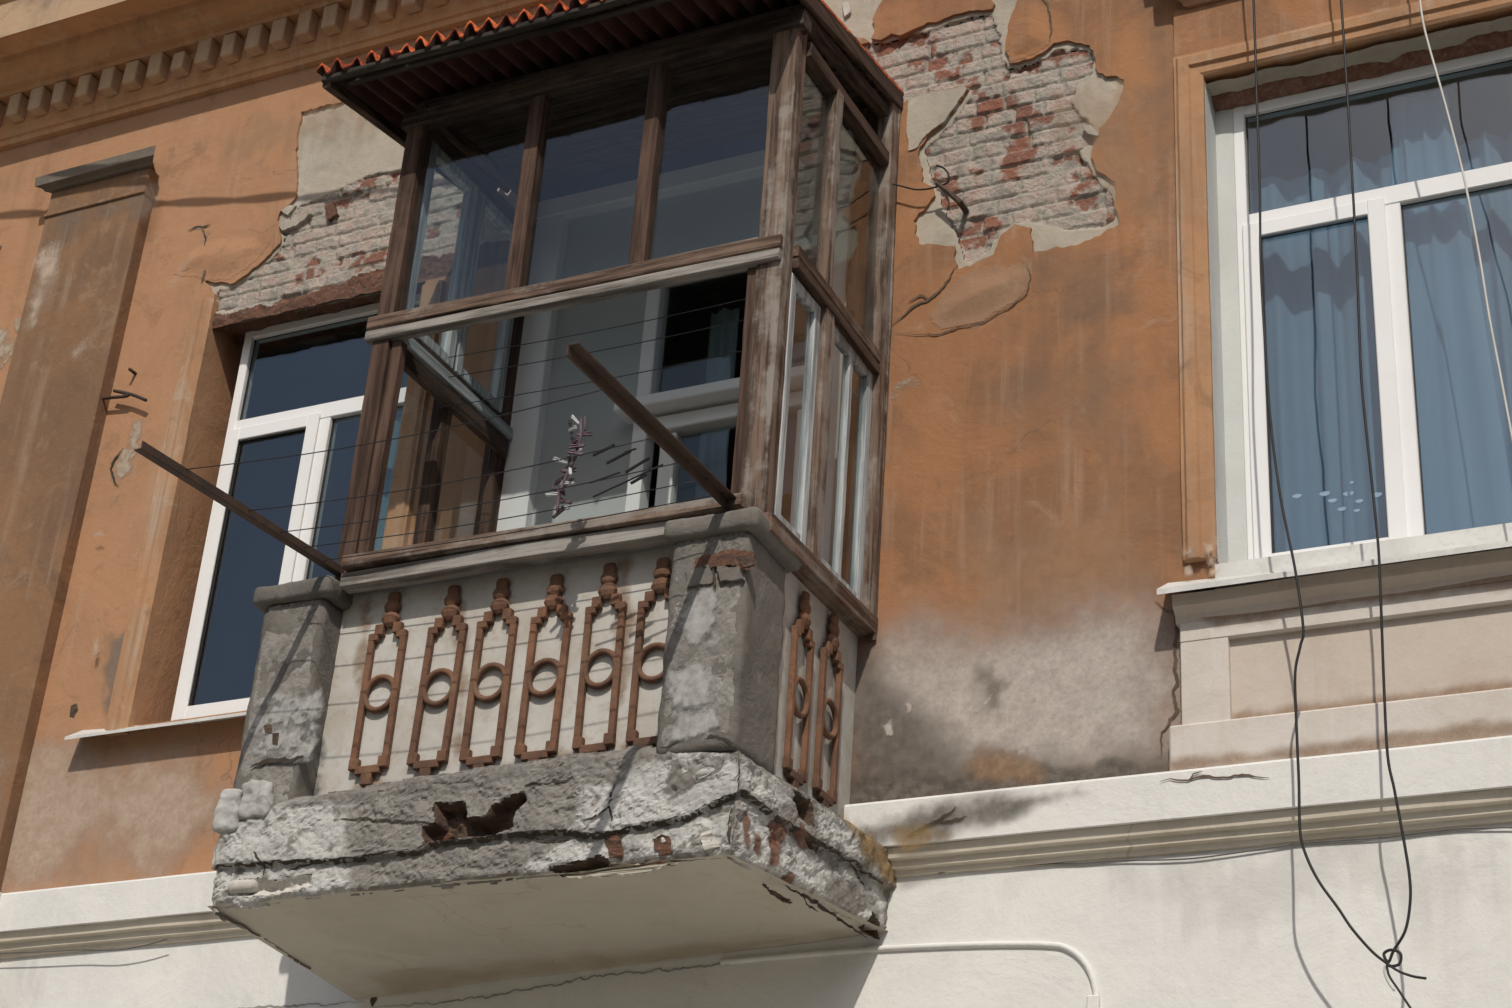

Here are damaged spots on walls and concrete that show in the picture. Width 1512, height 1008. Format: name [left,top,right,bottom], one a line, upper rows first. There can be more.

peeling [823,0,1124,269]
peeling [207,103,405,329]
peeling [417,171,463,285]
crack [893,266,1031,336]
spalling [680,549,756,644]
peeling [249,690,322,762]
peeling [660,662,724,797]
damp [849,611,1181,842]
crack [1155,601,1267,782]
spalling [421,793,527,845]
spalling [547,833,680,879]
peeling [741,789,819,904]